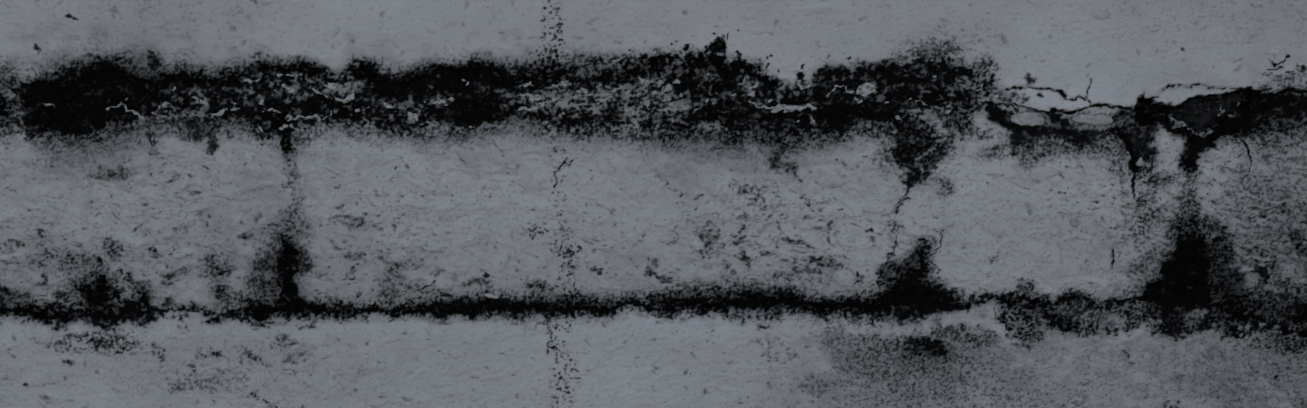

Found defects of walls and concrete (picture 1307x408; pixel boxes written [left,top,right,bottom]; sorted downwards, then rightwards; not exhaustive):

leakage [0,0,1175,229]
crack [980,78,1307,115]
leakage [1212,65,1307,149]
crack [1238,139,1252,179]
leakage [0,132,1307,404]